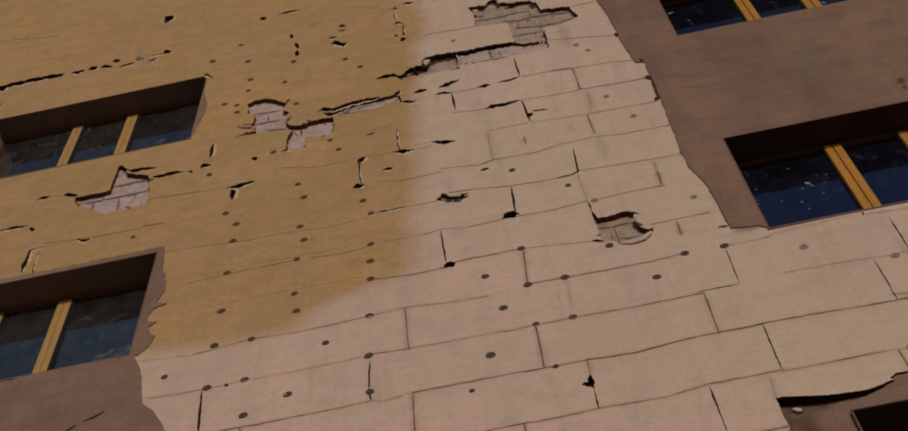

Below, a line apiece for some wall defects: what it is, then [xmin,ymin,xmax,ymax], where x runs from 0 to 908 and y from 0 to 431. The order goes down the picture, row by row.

crack [327,24,348,48]
crack [393,2,414,41]
spalling [407,0,578,76]
crack [0,50,171,106]
crack [317,42,547,121]
spalling [235,95,400,151]
spalling [64,165,193,214]
spalling [588,202,654,244]
crack [196,391,204,431]
crack [582,374,599,409]
spalling [776,371,908,431]